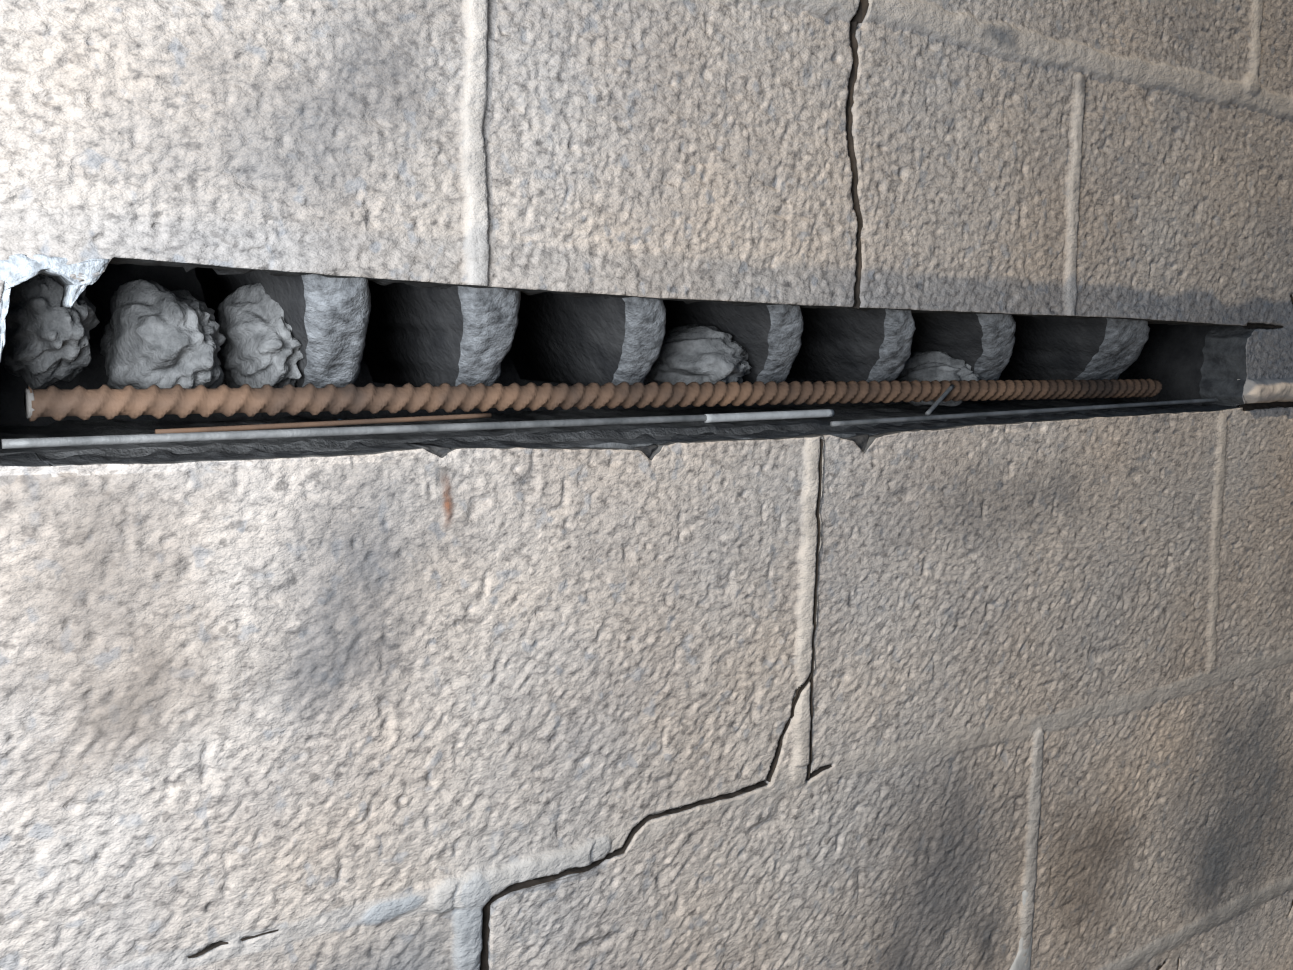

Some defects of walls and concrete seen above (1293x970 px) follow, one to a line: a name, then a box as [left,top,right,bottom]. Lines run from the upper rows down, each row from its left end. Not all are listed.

crack [846,0,869,309]
spalling [0,254,110,362]
spalling [24,379,1162,422]
spalling [404,443,452,457]
spalling [632,444,658,458]
spalling [841,433,869,452]
crack [480,439,832,970]
crack [188,930,278,958]